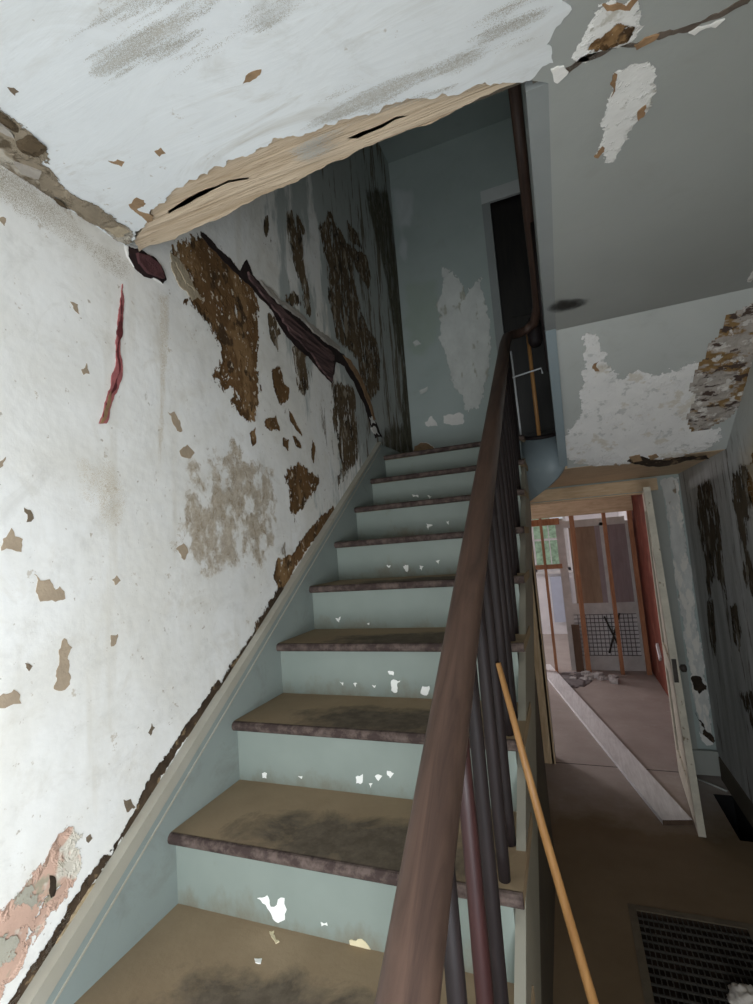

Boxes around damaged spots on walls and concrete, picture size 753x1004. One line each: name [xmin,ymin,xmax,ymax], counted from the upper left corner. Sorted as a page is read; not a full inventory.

flaking render [571,0,643,63]
crack [551,0,750,84]
peeling [594,61,659,163]
peeling [0,0,572,515]
flaking render [565,303,753,467]
flaking render [1,528,23,552]
flaking render [34,574,65,602]
flaking render [274,506,334,588]
flaking render [660,477,715,746]
flaking render [0,690,21,708]
flaking render [54,638,72,691]
flaking render [0,826,92,1000]